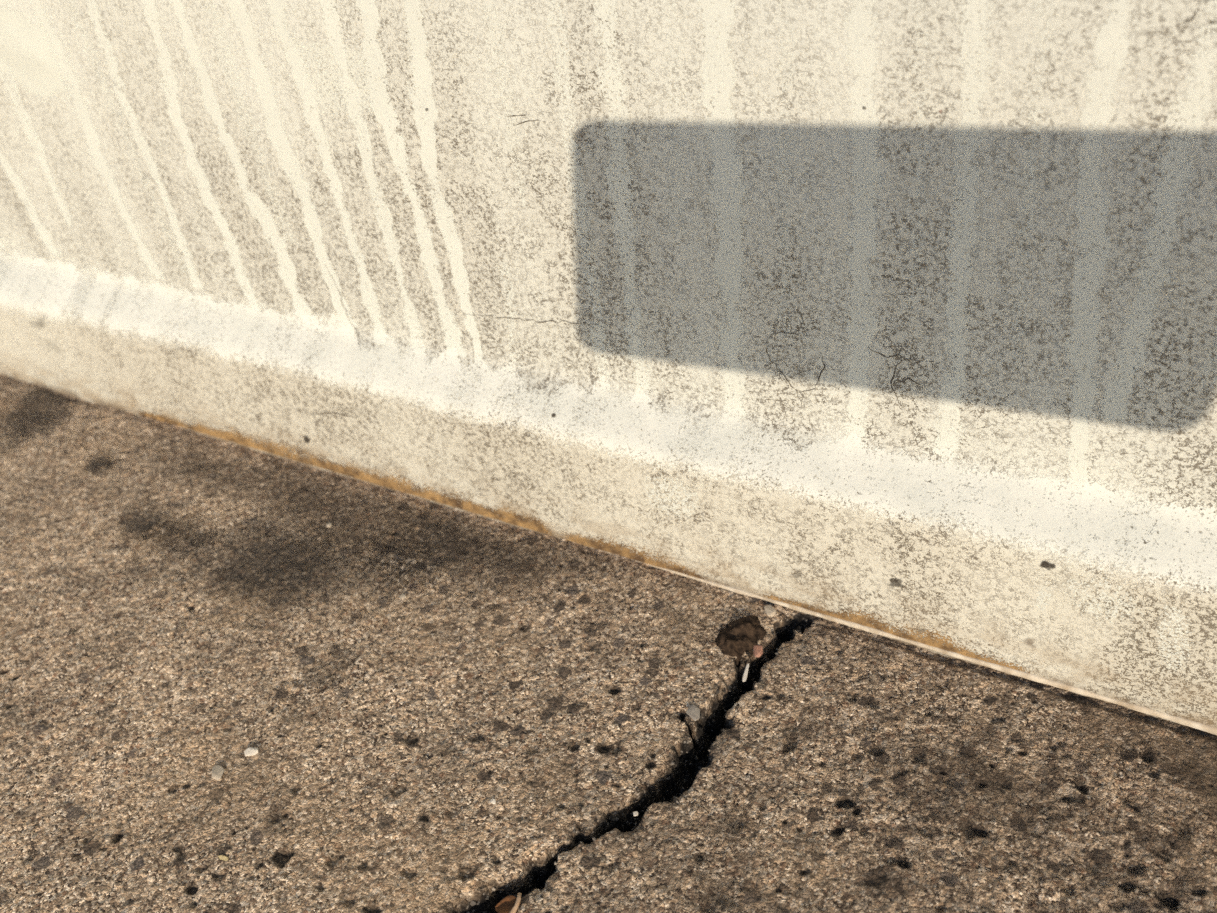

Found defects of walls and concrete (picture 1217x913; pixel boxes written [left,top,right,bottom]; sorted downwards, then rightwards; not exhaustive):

leakage [0,0,1217,672]
crack [433,609,821,913]